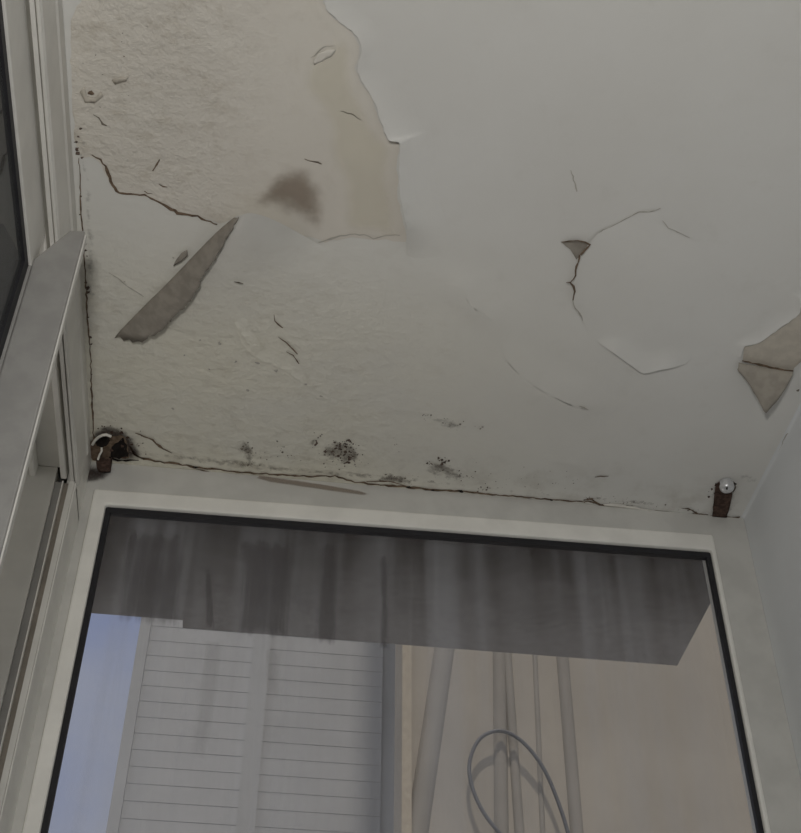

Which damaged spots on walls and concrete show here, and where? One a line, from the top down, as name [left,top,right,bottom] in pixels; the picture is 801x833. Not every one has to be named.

crack [92,155,217,225]
peeling [70,0,450,343]
peeling [729,288,801,413]
mould [312,434,363,470]